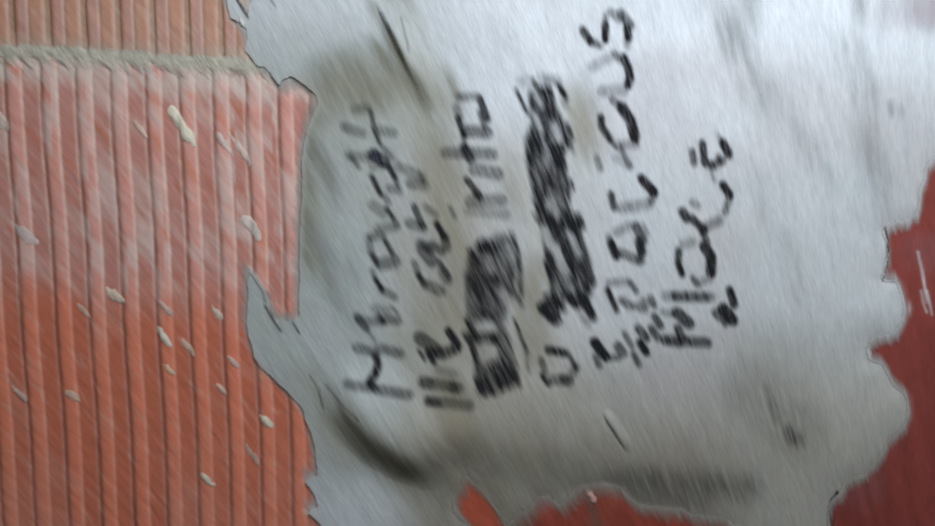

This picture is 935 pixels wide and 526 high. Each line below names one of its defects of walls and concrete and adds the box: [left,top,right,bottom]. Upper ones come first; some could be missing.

peeling [0,0,320,526]
peeling [457,483,504,526]
peeling [516,488,727,526]
peeling [831,163,935,526]